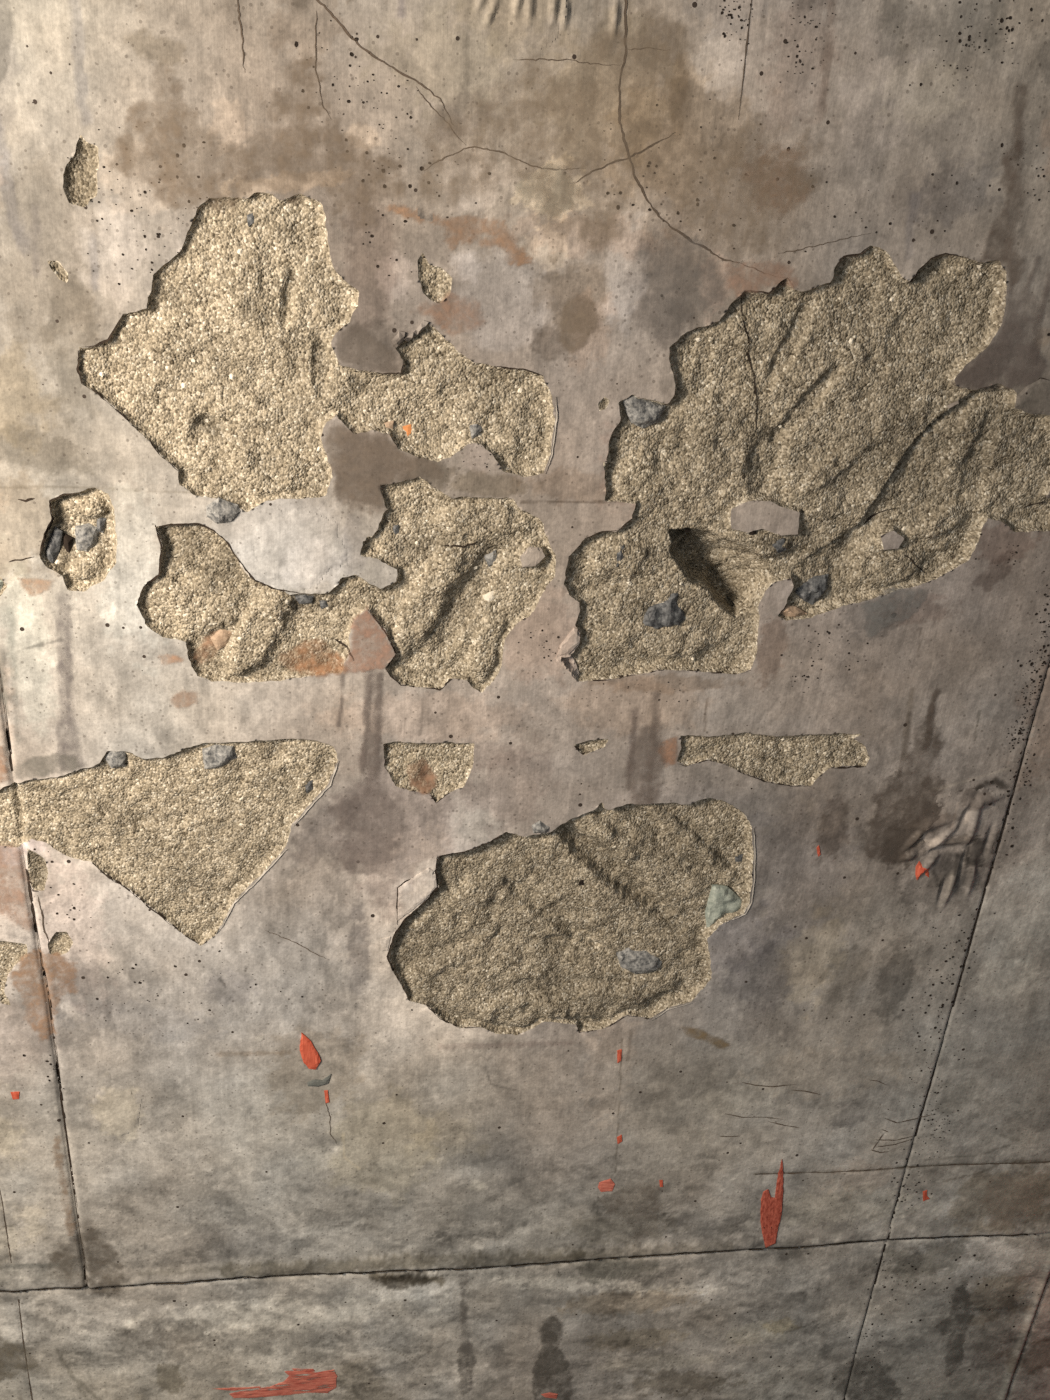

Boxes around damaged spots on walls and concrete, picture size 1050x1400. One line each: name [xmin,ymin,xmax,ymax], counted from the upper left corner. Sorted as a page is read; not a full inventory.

crack [237,0,245,70]
damp [118,106,254,207]
damp [517,157,590,216]
crack [315,0,864,278]
spalling [76,192,1050,693]
spalling [39,488,117,592]
spalling [677,732,869,787]
damp [916,690,941,755]
spalling [0,739,338,946]
damp [867,773,941,863]
spalling [380,798,756,1035]
damp [533,1317,572,1400]